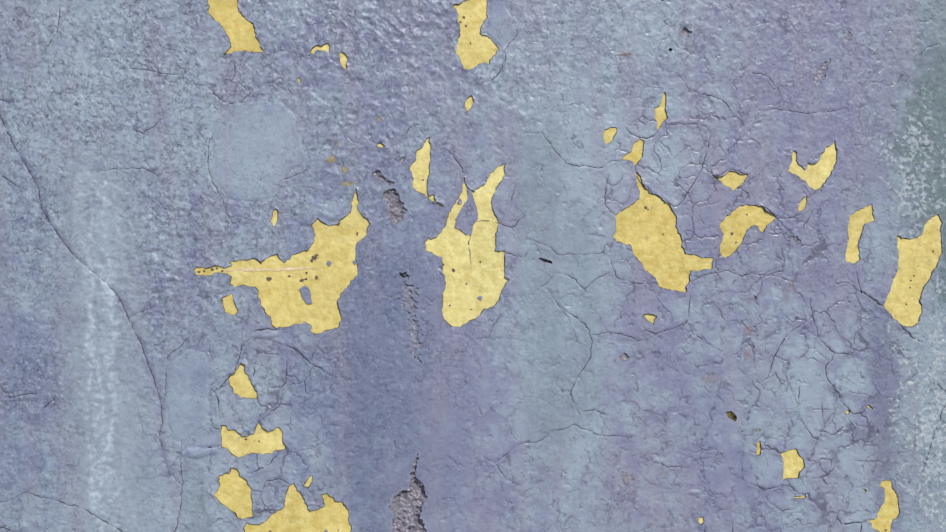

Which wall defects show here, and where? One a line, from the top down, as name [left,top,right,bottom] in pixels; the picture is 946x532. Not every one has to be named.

peeling [453,0,498,70]
crack [0,99,188,532]
crack [215,328,336,418]
peeling [193,189,371,334]
peeling [397,137,509,327]
crack [468,185,780,483]
crack [523,93,749,215]
peeling [613,139,776,292]
crack [766,207,814,237]
crack [752,272,883,511]
peeling [884,214,943,328]
peeling [214,422,352,532]